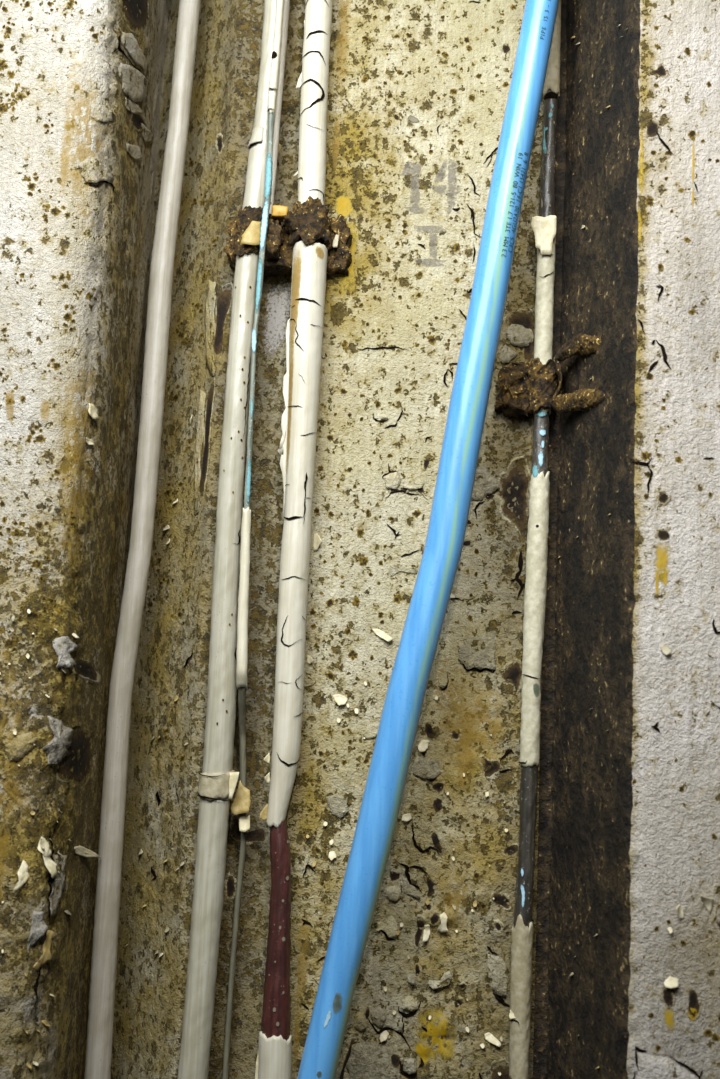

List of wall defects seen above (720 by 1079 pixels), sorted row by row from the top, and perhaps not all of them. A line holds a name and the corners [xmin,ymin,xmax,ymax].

crack [359,343,407,351]
crack [443,363,457,387]
crack [373,409,403,428]
crack [387,524,419,557]
peeling [52,629,101,684]
spalling [33,716,97,786]
peeling [14,860,29,891]
peeling [24,836,101,977]
peeling [388,869,468,1009]
damp [416,1010,456,1062]
spalling [480,1032,510,1079]
crack [633,1046,703,1079]